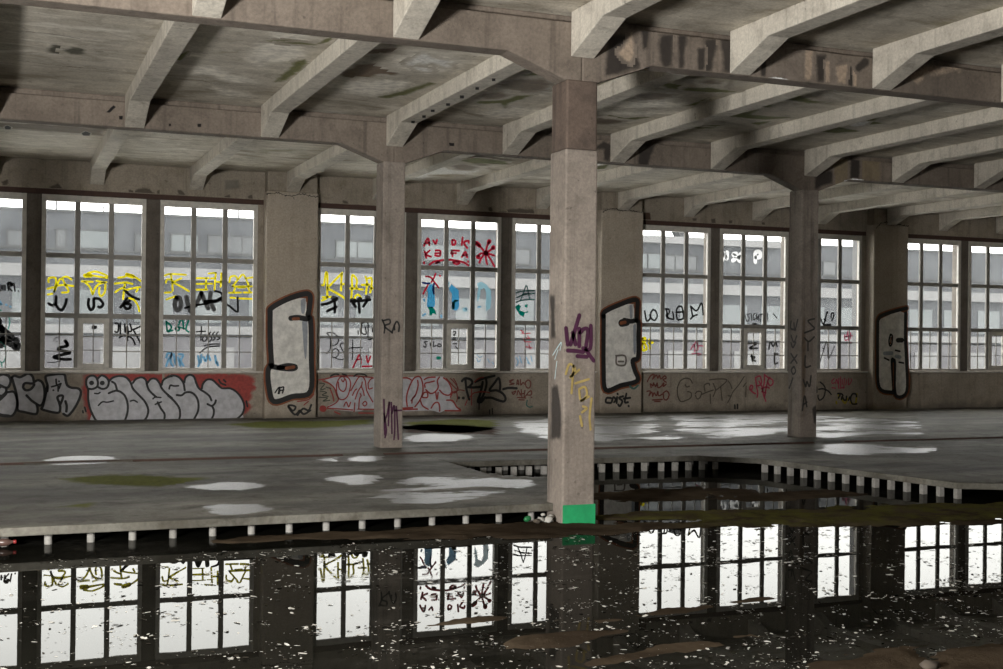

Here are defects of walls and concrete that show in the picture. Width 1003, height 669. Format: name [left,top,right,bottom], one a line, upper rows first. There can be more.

leakage [171,30,327,101]
leakage [319,46,478,100]